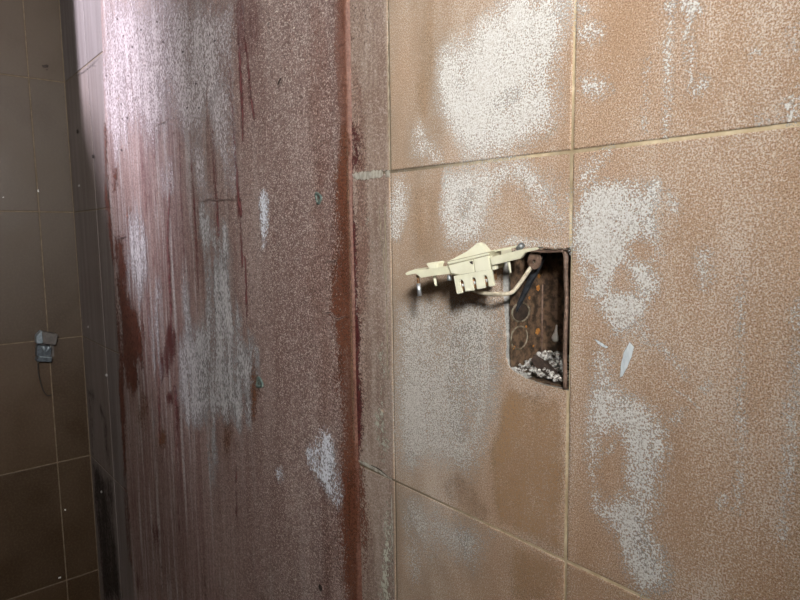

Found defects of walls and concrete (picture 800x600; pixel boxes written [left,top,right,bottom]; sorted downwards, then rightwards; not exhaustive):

water stain [660,0,709,140]
corrosion [104,125,148,564]
corrosion [159,319,180,427]
water stain [103,0,259,484]
corrosion [249,362,259,421]
corrosion [323,0,372,600]
water stain [389,172,410,242]
water stain [407,0,689,599]
water stain [94,469,119,600]
water stain [305,425,343,509]